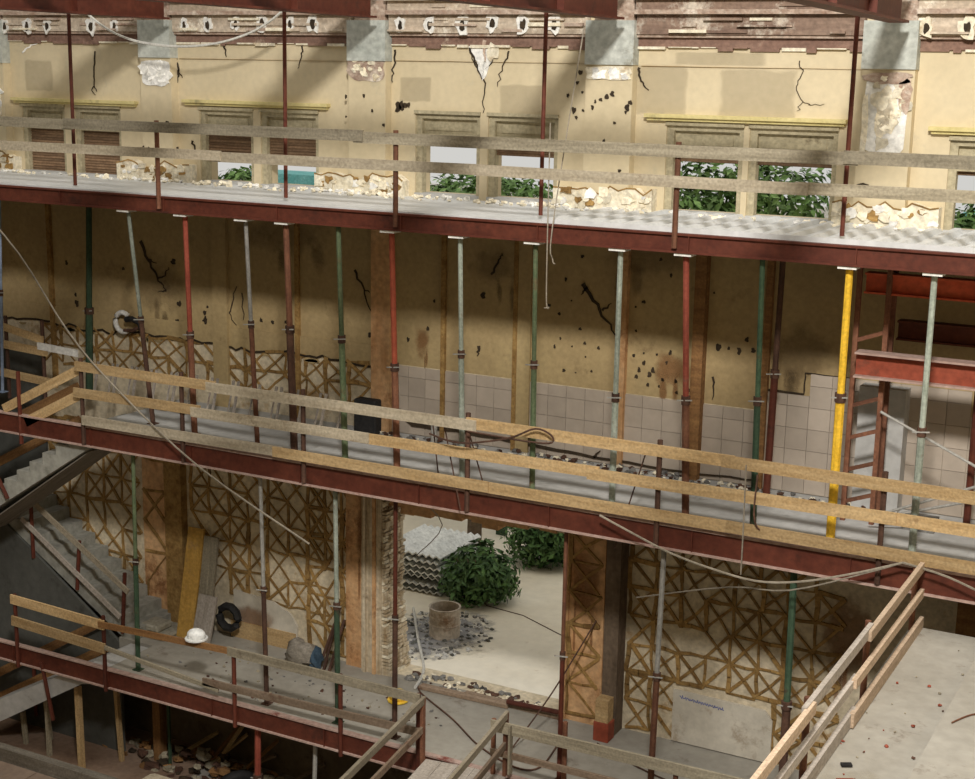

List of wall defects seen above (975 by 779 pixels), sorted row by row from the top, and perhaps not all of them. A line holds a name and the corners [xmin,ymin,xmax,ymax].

peeling [138,60,173,87]
spalling [346,61,385,82]
crack [424,51,520,113]
crack [786,61,823,111]
peeling [859,72,913,153]
spalling [314,172,409,197]
spalling [831,199,942,230]
crack [139,240,169,292]
crack [354,269,371,311]
crack [581,283,615,335]